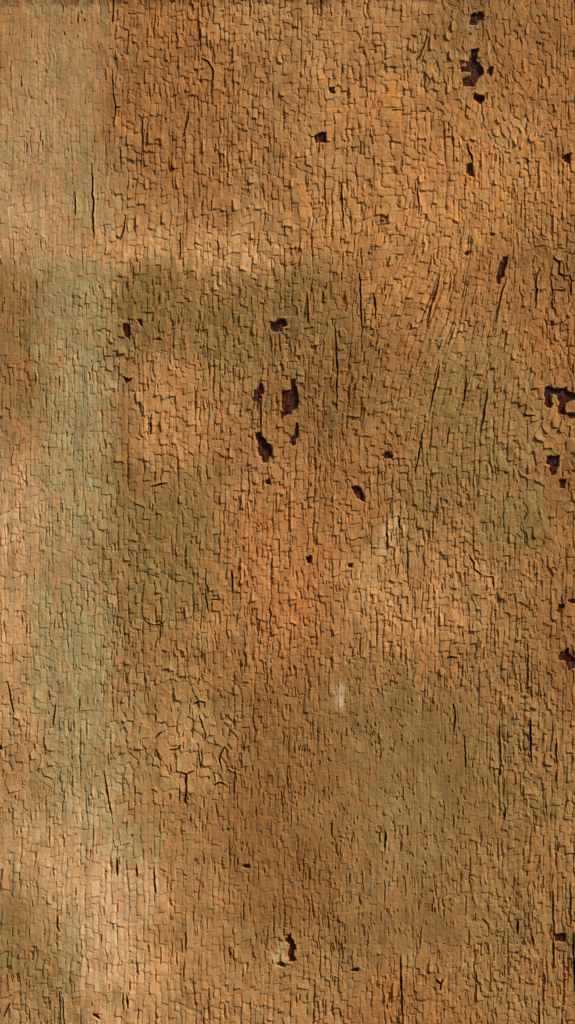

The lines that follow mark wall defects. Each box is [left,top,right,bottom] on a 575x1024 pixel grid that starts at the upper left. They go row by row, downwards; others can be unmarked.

peeling [460,39,493,105]
crack [74,164,126,239]
peeling [496,257,508,285]
crack [534,256,574,314]
peeling [255,379,299,463]
peeling [544,386,575,422]
peeling [546,455,565,488]
crack [526,643,558,763]
crack [154,731,236,804]
crack [115,858,157,894]
peeling [277,930,298,967]
crack [516,883,575,986]